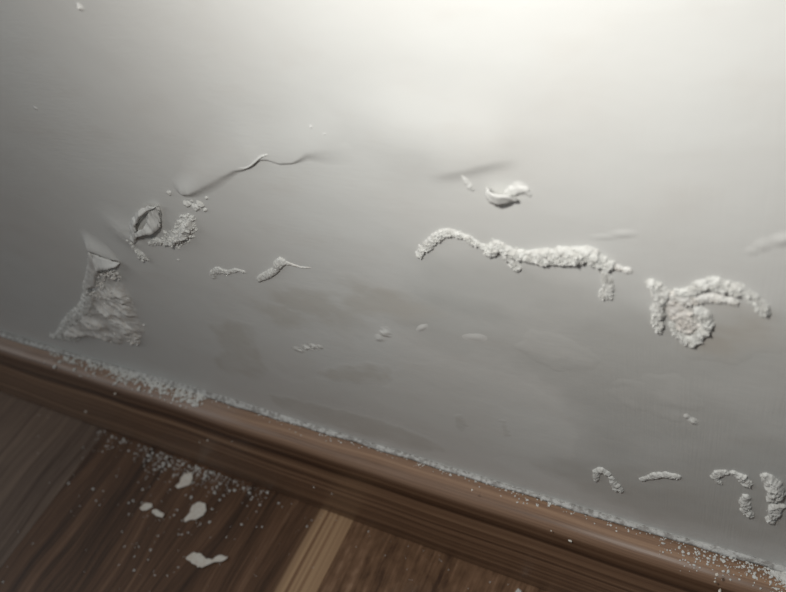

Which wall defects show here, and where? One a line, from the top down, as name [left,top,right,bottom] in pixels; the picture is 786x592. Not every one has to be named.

spalling [49,196,208,345]
water stain [206,227,786,554]